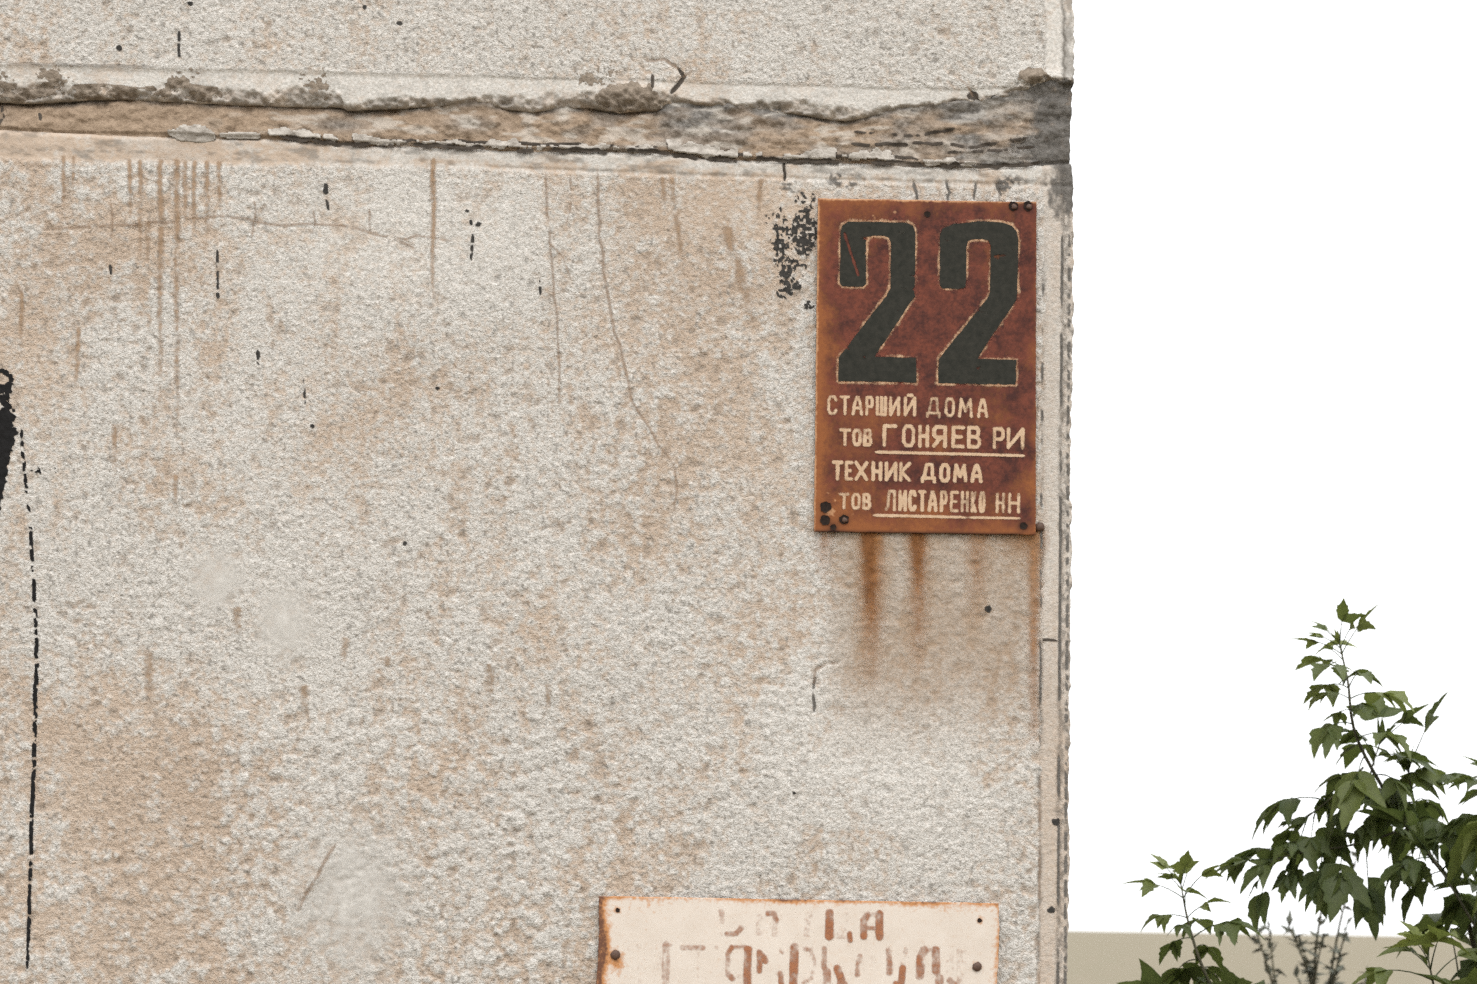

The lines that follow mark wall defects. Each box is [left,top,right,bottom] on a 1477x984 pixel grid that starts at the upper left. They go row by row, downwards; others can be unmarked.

spalling [0,64,222,102]
spalling [299,67,336,108]
spalling [575,59,667,113]
spalling [1018,67,1073,85]
peeling [168,124,762,159]
peeling [783,147,895,161]
peeling [923,157,976,168]
water stain [128,160,221,329]
rust [855,533,889,664]
rust [905,533,936,627]